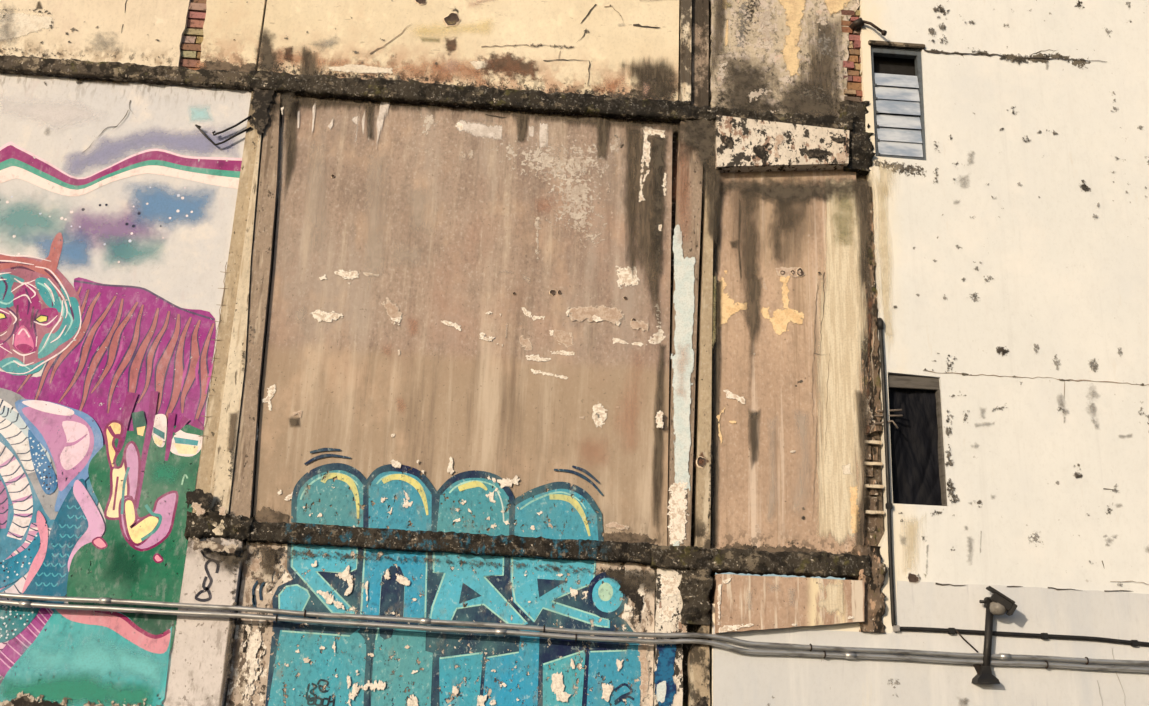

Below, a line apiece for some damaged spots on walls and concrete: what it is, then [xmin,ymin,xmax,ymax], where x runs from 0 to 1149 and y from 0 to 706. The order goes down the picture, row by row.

corrosion [318,62,396,74]
leakage [257,32,677,100]
corrosion [411,52,538,80]
corrosion [604,61,669,93]
leakage [712,0,838,117]
flaking render [824,0,863,102]
crack [924,49,1106,68]
leakage [249,88,938,555]
peeling [761,179,903,546]
crack [926,370,1149,394]
peeling [601,567,688,633]
peeling [236,622,268,706]